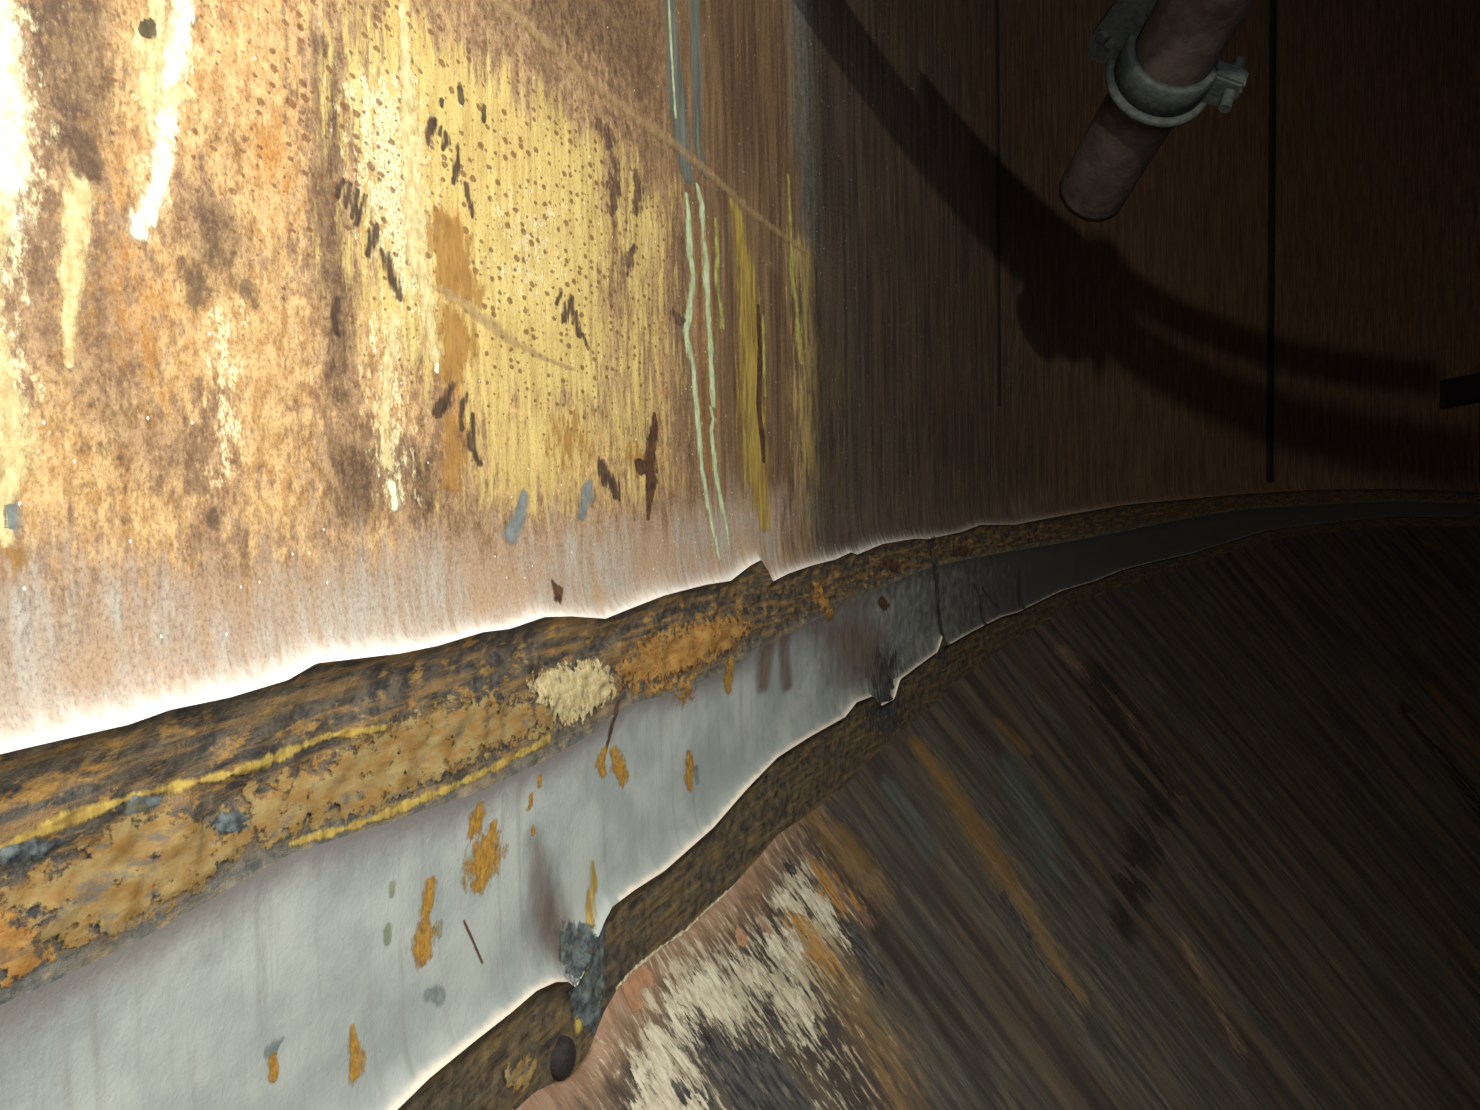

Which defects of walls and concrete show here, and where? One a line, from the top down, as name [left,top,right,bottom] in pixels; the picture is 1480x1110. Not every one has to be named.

water stain [0,0,34,310]
water stain [129,0,196,240]
water stain [397,0,441,373]
water stain [666,0,770,561]
water stain [0,330,40,548]
water stain [378,316,402,511]
rust [552,580,563,603]
rust [0,609,752,987]
rust [265,1037,284,1083]
rust [349,1024,366,1082]
rust [504,1052,537,1094]
rust [559,861,608,1037]